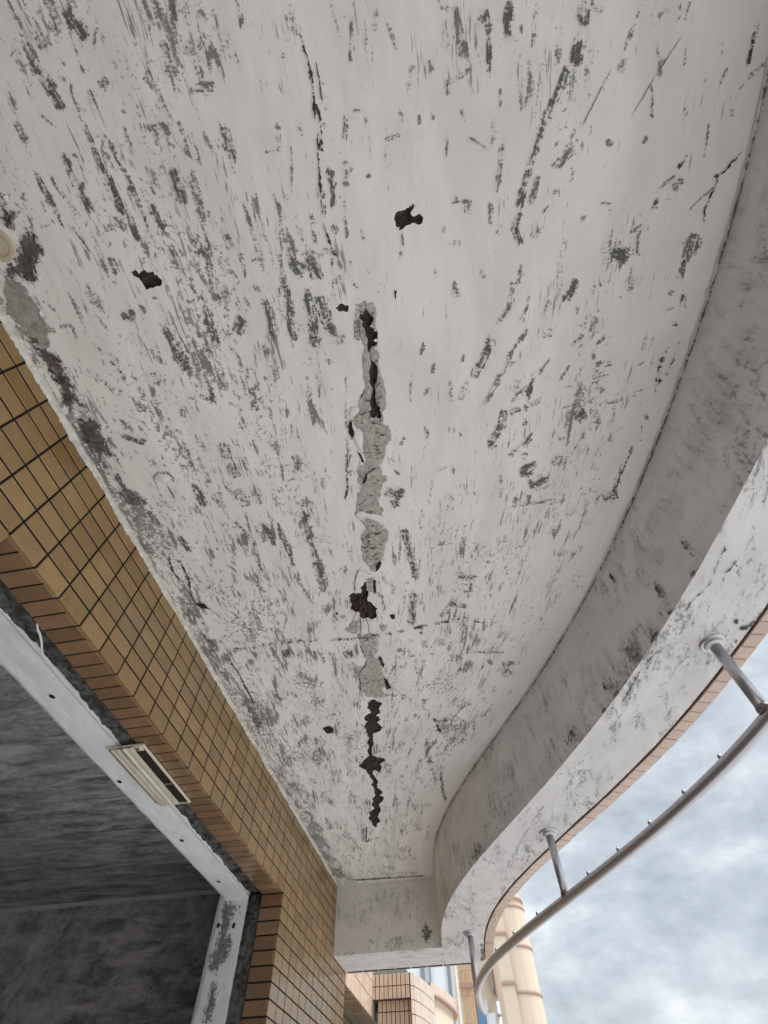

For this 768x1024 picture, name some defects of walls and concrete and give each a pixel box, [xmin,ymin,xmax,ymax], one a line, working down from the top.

peeling [0,189,149,509]
spalling [131,270,162,290]
spalling [394,204,423,231]
crack [344,31,768,881]
crack [217,538,496,704]
spalling [349,582,378,619]